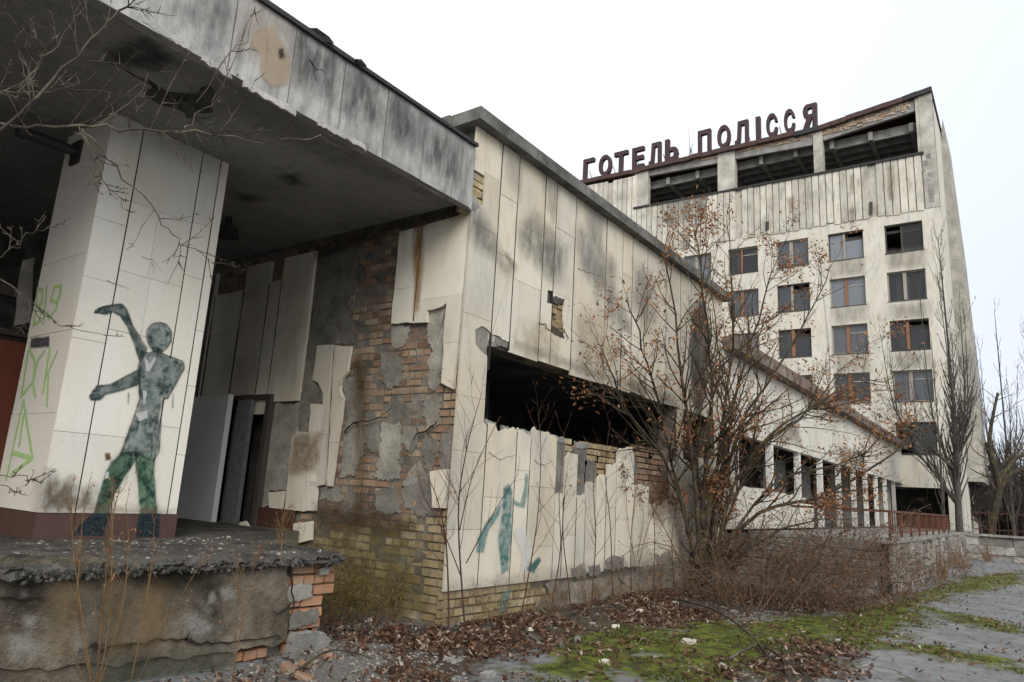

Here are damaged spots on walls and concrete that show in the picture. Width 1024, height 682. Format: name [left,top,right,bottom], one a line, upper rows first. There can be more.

peeling [141,12,296,119]
spalling [316,118,366,152]
spalling [547,292,565,339]
spalling [475,327,508,354]
crack [344,399,396,434]
spalling [319,307,454,517]
crack [404,421,437,459]
spalling [282,630,332,658]